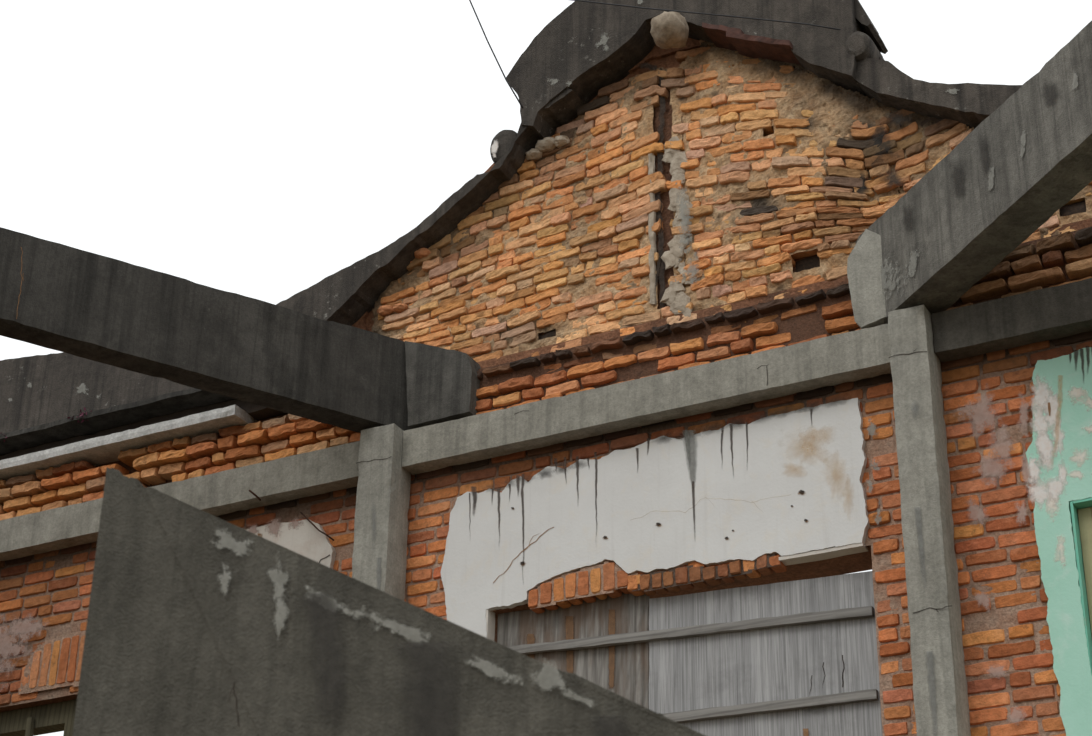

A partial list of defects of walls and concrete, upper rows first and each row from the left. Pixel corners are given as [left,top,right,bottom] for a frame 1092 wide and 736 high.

crack [639,63,693,317]
leakage [469,486,477,529]
leakage [490,474,524,562]
leakage [542,452,597,525]
leakage [685,430,696,529]
leakage [709,421,748,465]
peeling [1017,376,1092,521]
peeling [268,562,289,636]
peeling [306,586,431,642]
flaking render [528,554,787,614]
flaking render [0,616,86,695]
peeling [466,657,594,707]